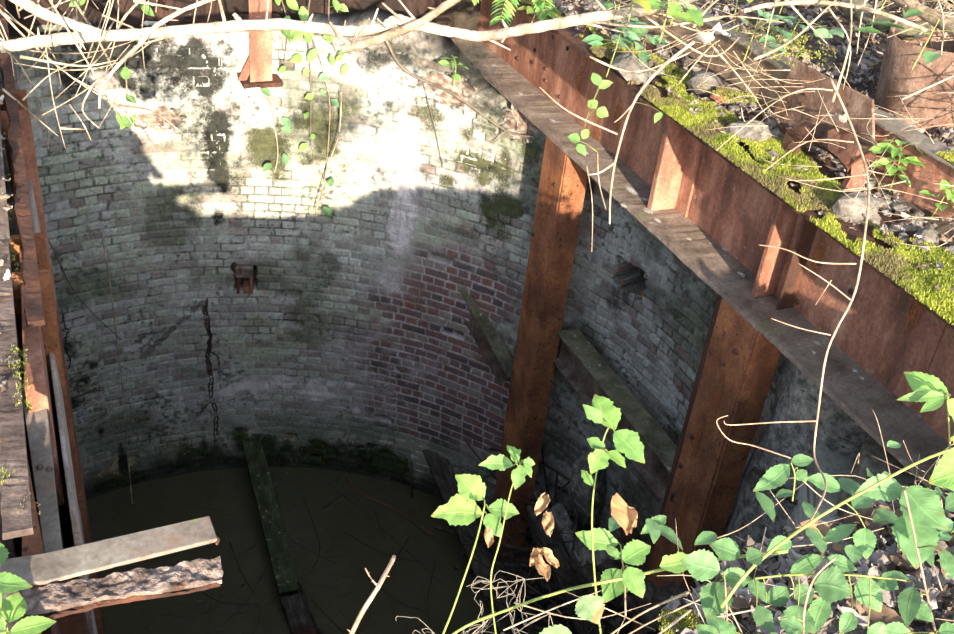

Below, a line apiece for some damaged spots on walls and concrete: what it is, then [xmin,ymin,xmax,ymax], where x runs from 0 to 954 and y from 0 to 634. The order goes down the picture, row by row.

water stain [46,36,241,193]
efflorescence [372,111,433,294]
crack [200,298,229,466]
water stain [232,427,409,481]